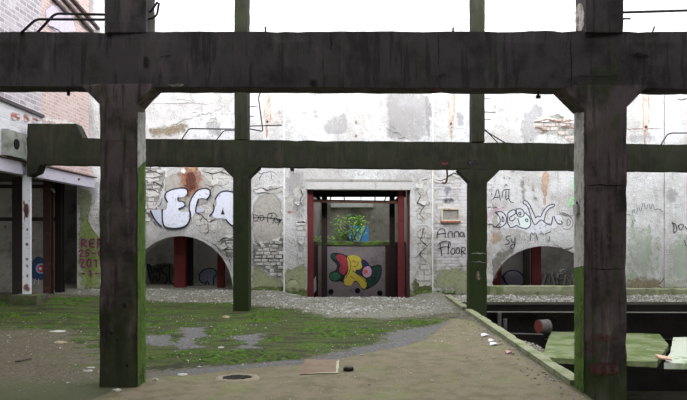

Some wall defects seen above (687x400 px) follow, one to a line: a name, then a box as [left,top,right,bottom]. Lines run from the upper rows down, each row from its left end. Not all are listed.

flaking render [533,112,574,143]
rust [178,167,201,199]
flaking render [251,185,307,265]
crack [417,172,458,262]
flaking render [251,237,284,279]